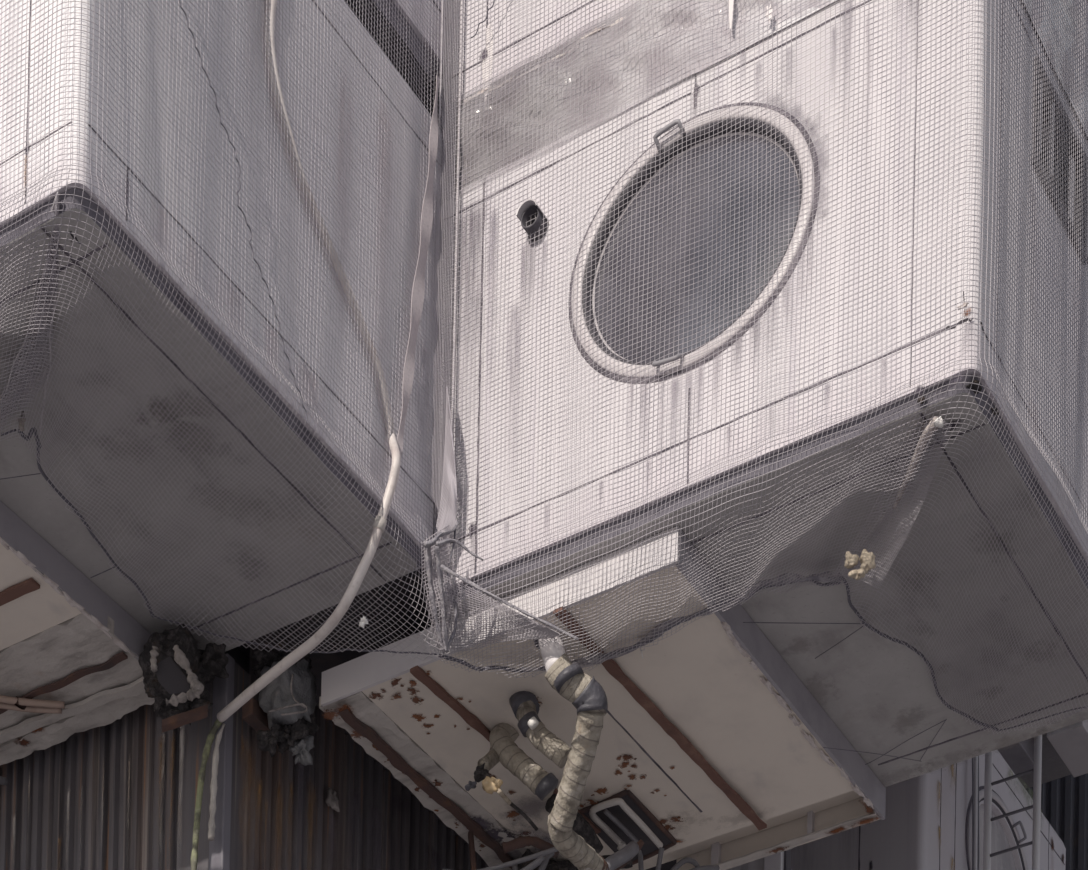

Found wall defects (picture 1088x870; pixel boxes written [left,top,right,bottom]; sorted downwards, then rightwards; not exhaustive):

corrosion [369,678,440,734]
corrosion [614,754,647,789]